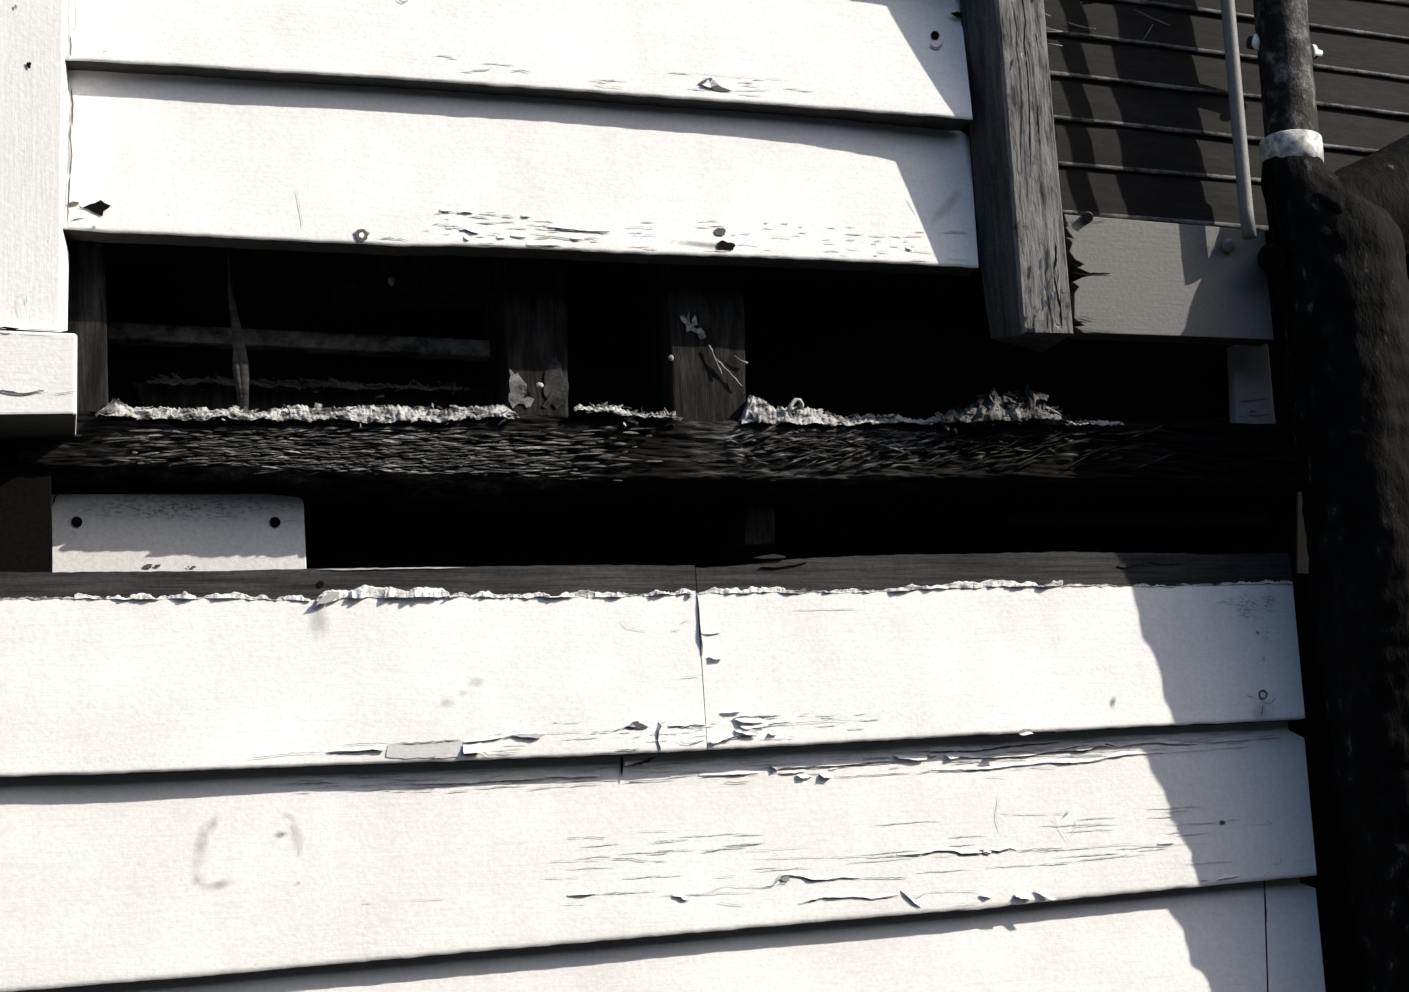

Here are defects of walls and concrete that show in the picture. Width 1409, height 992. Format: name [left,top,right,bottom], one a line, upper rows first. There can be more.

crack [0,296,56,331]
crack [0,388,77,396]
peeling [0,579,1292,608]
peeling [611,721,648,732]
peeling [710,707,853,743]
peeling [247,740,518,759]
peeling [621,748,660,767]